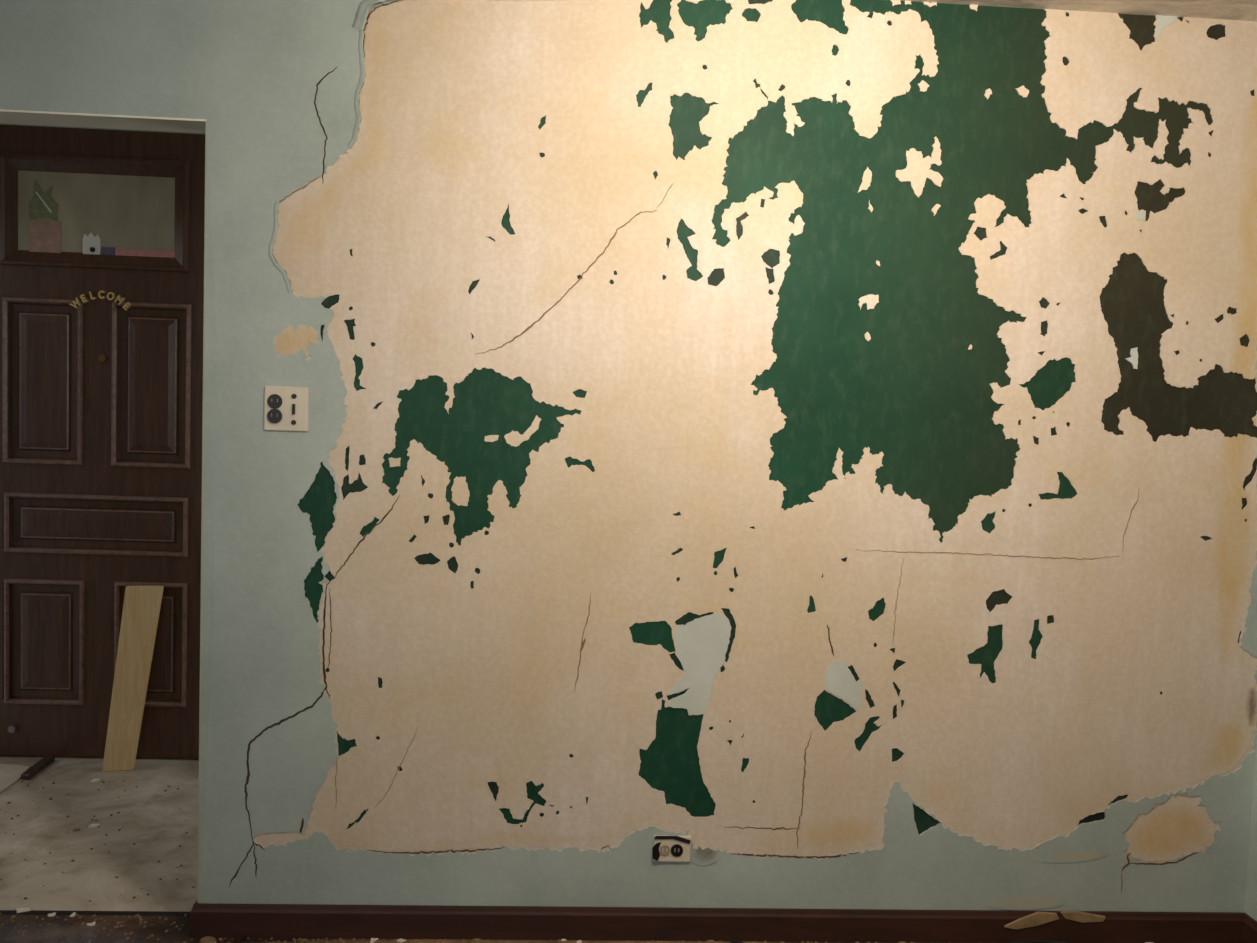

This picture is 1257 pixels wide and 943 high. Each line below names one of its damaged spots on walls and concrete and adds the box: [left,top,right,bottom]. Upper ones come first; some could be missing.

crack [477,184,673,354]
water stain [1226,61,1257,389]
peeling [254,0,1257,861]
water stain [1211,416,1257,679]
crack [229,495,400,887]
crack [375,727,418,807]
water stain [1128,802,1216,861]